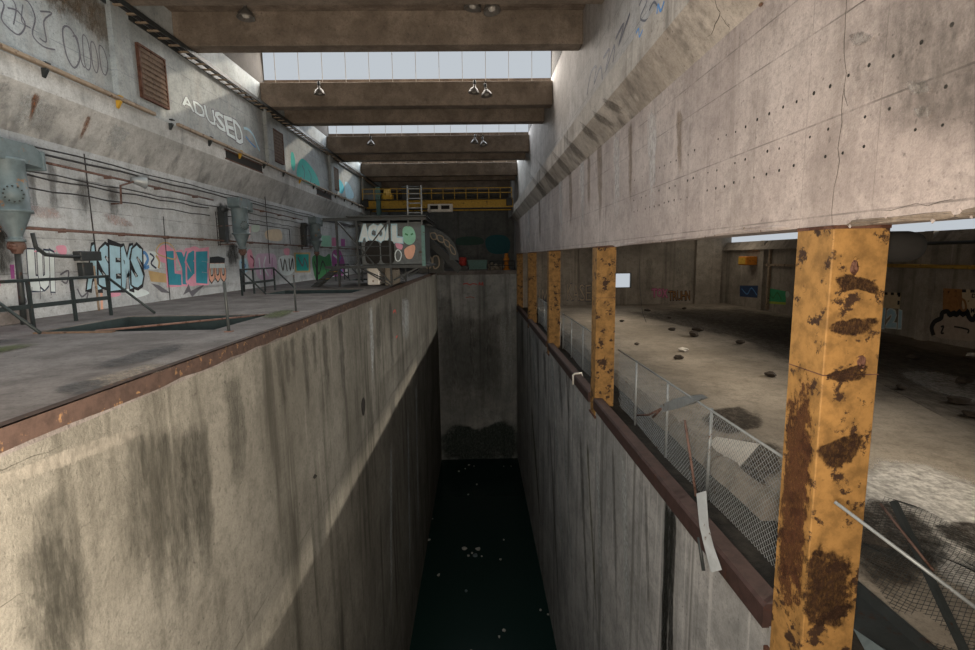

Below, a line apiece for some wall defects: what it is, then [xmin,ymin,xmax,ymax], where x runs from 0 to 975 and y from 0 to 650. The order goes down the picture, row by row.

crack [832,0,865,204]
rust [836,274,878,294]
rust [831,318,878,336]
rust [827,364,867,382]
rust [777,373,861,627]